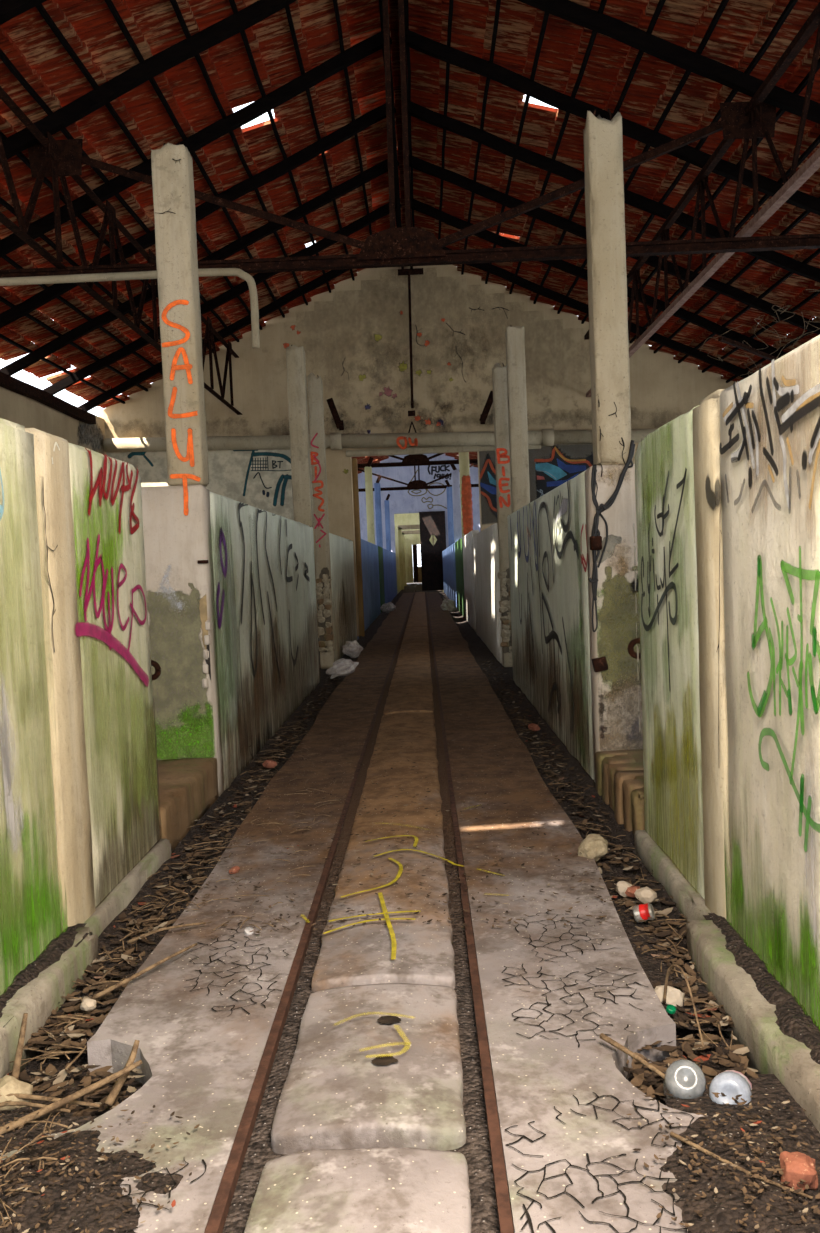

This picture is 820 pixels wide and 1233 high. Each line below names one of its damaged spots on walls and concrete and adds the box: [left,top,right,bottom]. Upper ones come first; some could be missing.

flaking render [147,583,214,760]
flaking render [597,524,641,732]
crack [186,920,289,1015]
crack [501,909,648,1047]
crack [504,1092,707,1233]